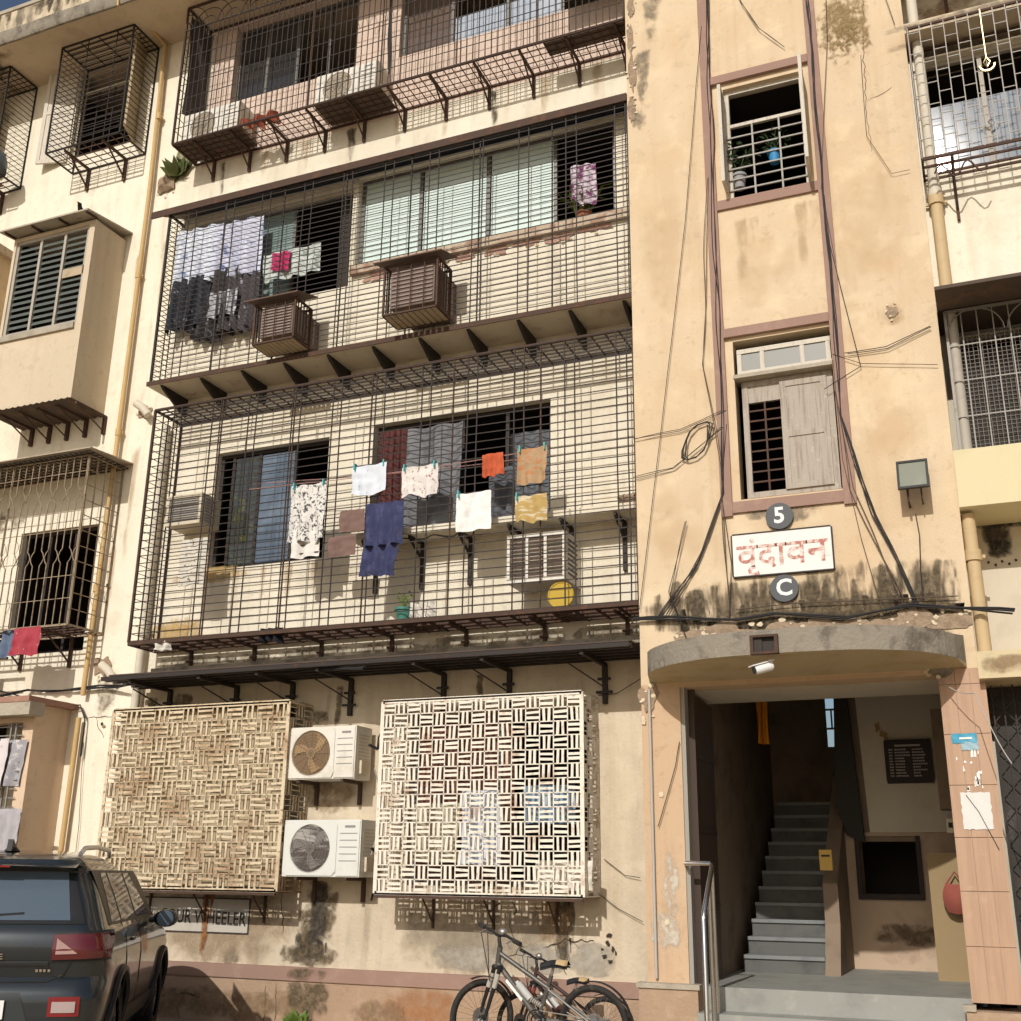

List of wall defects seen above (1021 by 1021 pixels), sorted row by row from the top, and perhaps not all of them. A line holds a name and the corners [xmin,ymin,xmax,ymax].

leakage [36,0,69,13]
leakage [819,0,871,58]
leakage [635,51,648,96]
leakage [654,560,945,630]
rust [199,894,214,952]
leakage [158,881,338,1020]
leakage [405,901,575,963]